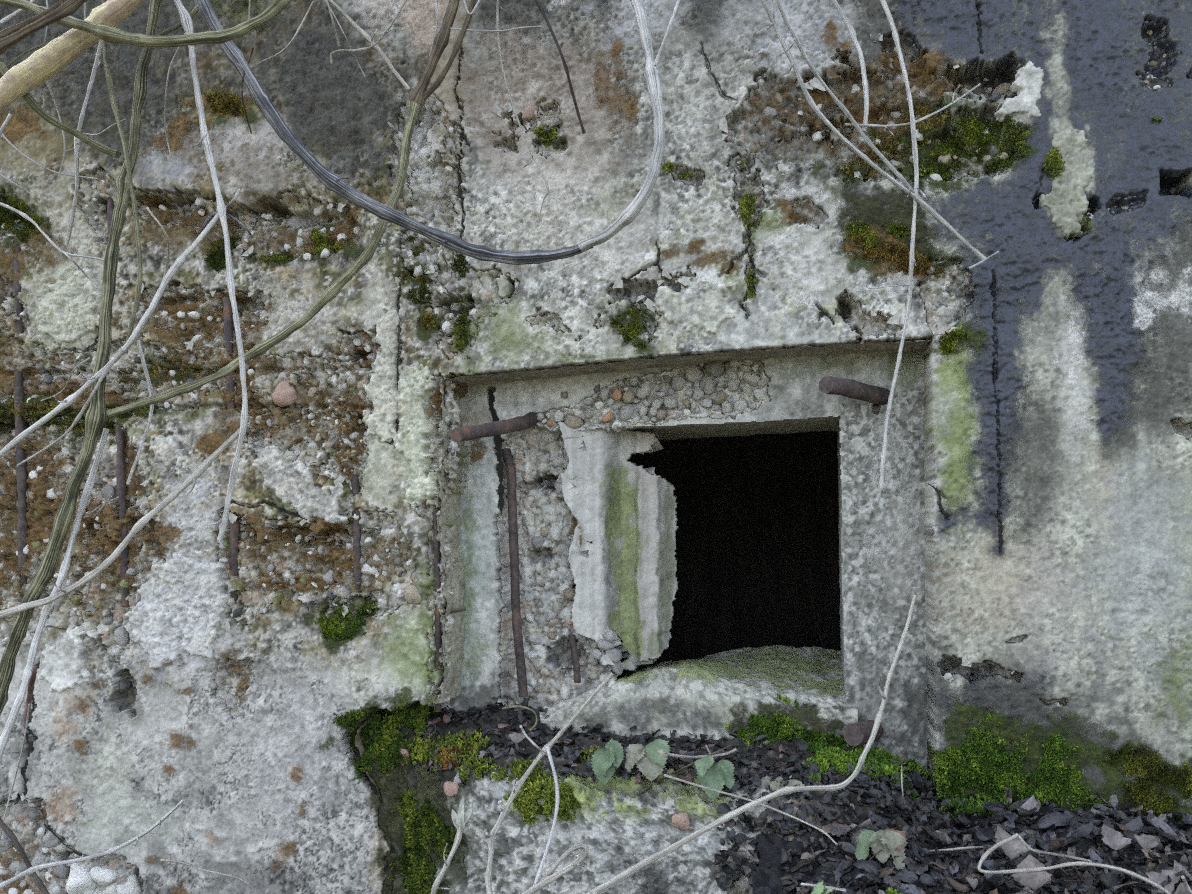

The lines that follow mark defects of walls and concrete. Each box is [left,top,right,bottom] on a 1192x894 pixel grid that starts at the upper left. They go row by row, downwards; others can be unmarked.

corrosion [0,223,91,601]
corrosion [50,422,186,606]
peeling [0,92,520,719]
corrosion [133,285,410,609]
corrosion [450,412,539,697]
water stain [477,0,570,34]
spalling [496,425,623,715]
spalling [719,34,1044,296]
crack [976,3,984,52]
water stain [781,0,1192,556]
crack [992,269,1004,552]
spalling [0,791,144,894]